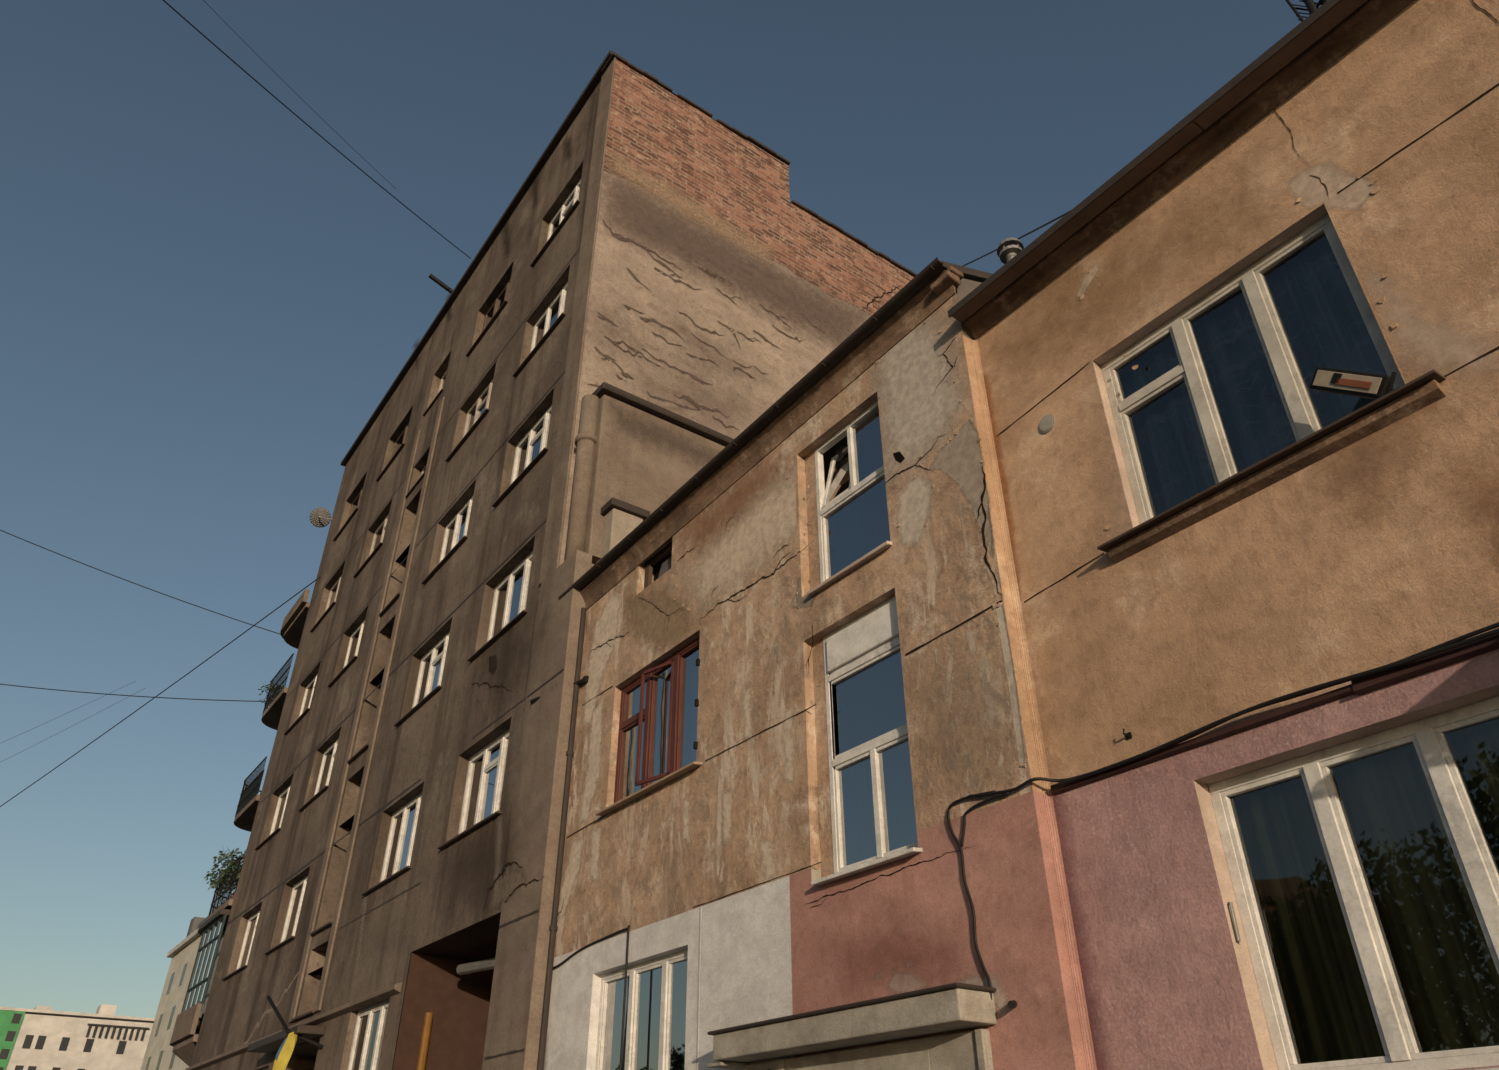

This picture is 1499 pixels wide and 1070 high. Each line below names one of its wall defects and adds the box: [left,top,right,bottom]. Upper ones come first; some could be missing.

crack [1472,0,1499,23]
flaking render [1287,161,1380,209]
crack [588,219,821,430]
crack [864,285,900,309]
peeling [876,322,994,557]
crack [976,465,1003,595]
crack [591,540,814,651]